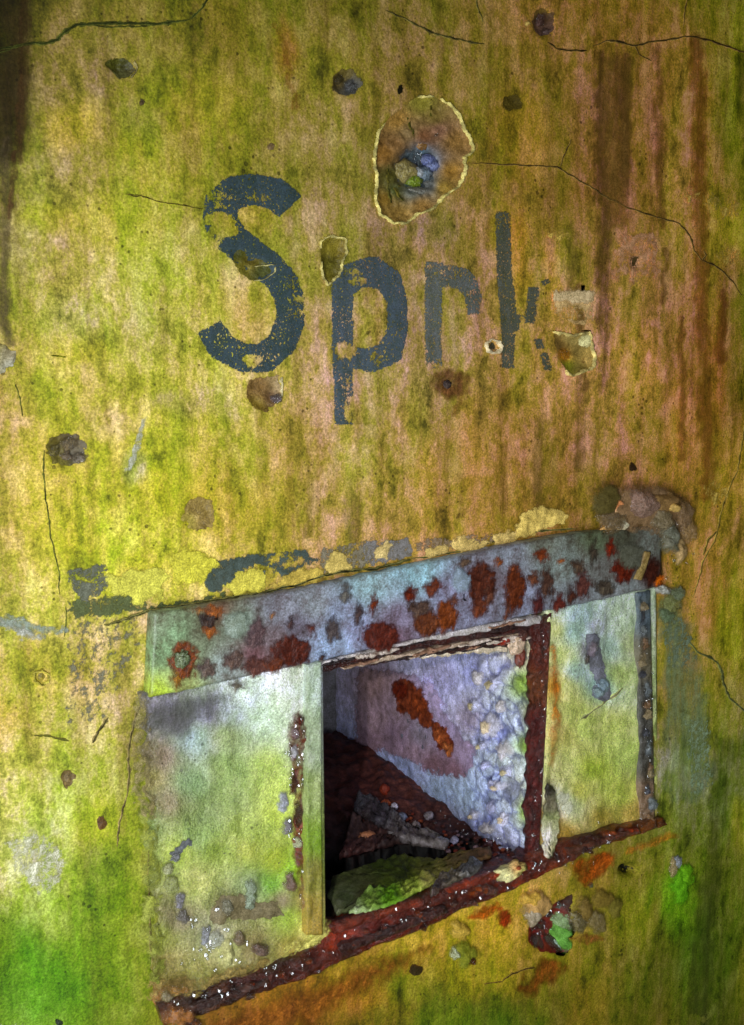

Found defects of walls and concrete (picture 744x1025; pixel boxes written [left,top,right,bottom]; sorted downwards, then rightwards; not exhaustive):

crack [0,0,208,53]
spalling [372,85,475,225]
leakage [579,53,631,339]
crack [471,140,742,295]
leakage [690,36,710,267]
leakage [0,233,10,340]
rust [167,614,341,693]
peeling [65,533,495,723]
rust [392,675,454,757]
rust [404,538,665,638]
crack [689,642,744,712]
spalling [528,895,573,954]